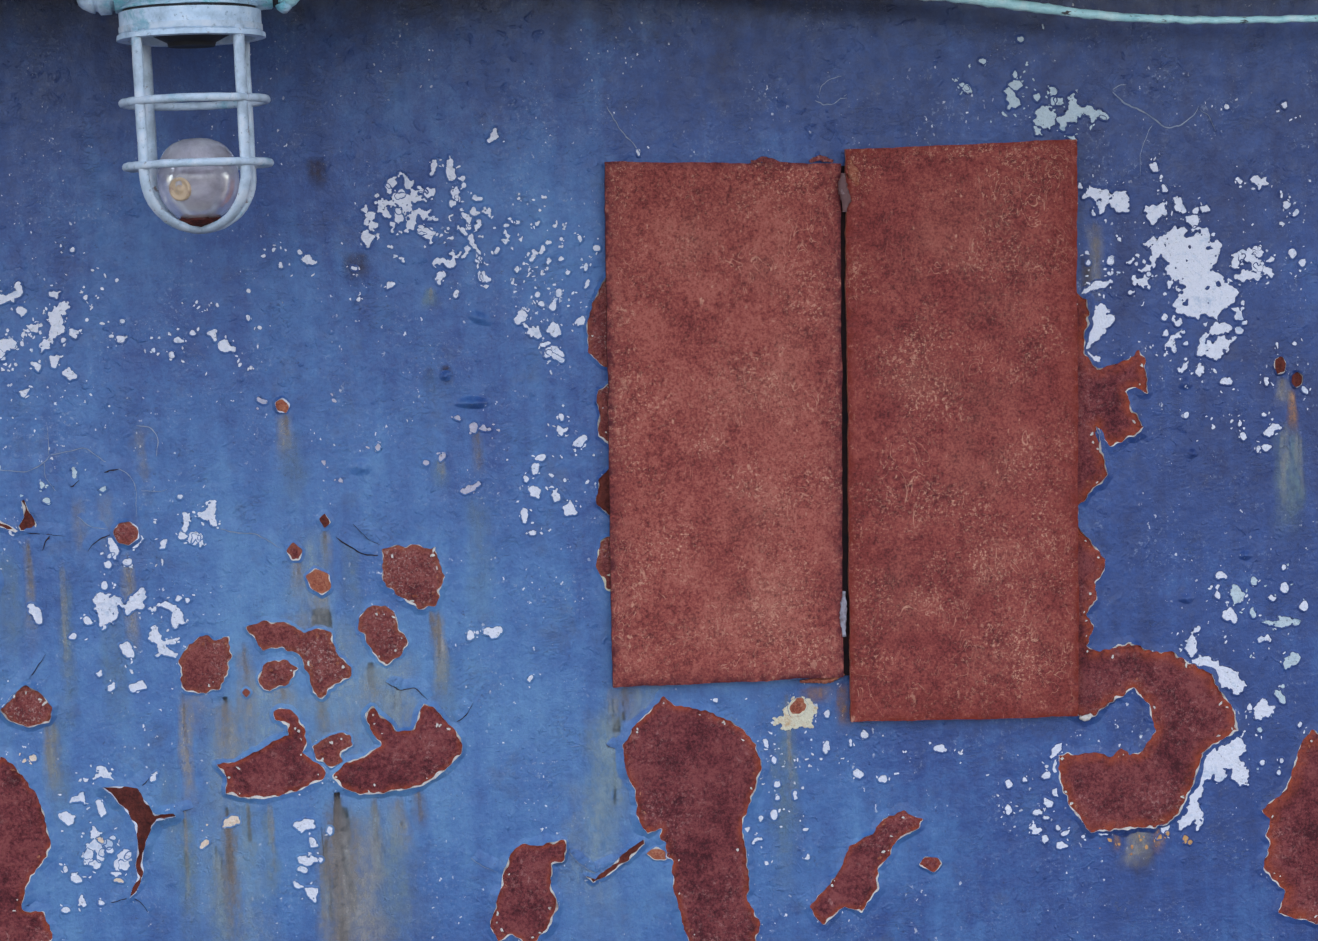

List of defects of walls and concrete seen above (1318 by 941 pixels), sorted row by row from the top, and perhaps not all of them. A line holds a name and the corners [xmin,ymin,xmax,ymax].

corrosion [809,155,860,186]
spalling [0,267,130,400]
spalling [144,300,254,375]
spalling [358,153,611,594]
peeling [986,157,1318,928]
peeling [0,679,59,732]
peeling [66,492,467,851]
peeling [0,746,186,941]
spalling [291,816,335,905]
peeling [485,827,570,941]
peeling [581,686,899,941]
peeling [802,802,929,931]